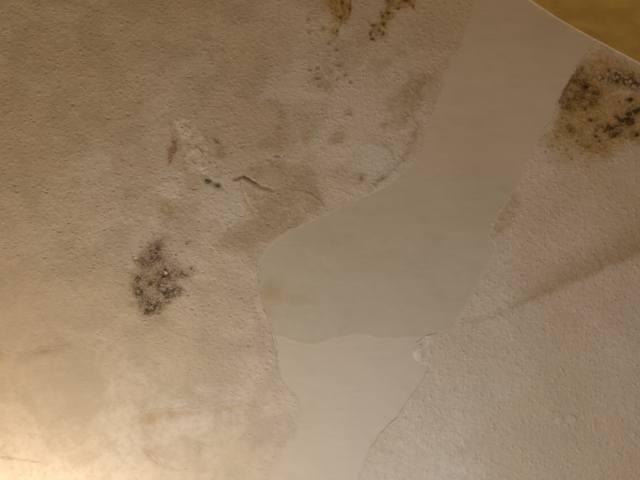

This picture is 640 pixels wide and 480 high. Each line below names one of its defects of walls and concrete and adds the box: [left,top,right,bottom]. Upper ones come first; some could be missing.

mould [532,47,640,176]
damp [118,193,196,328]